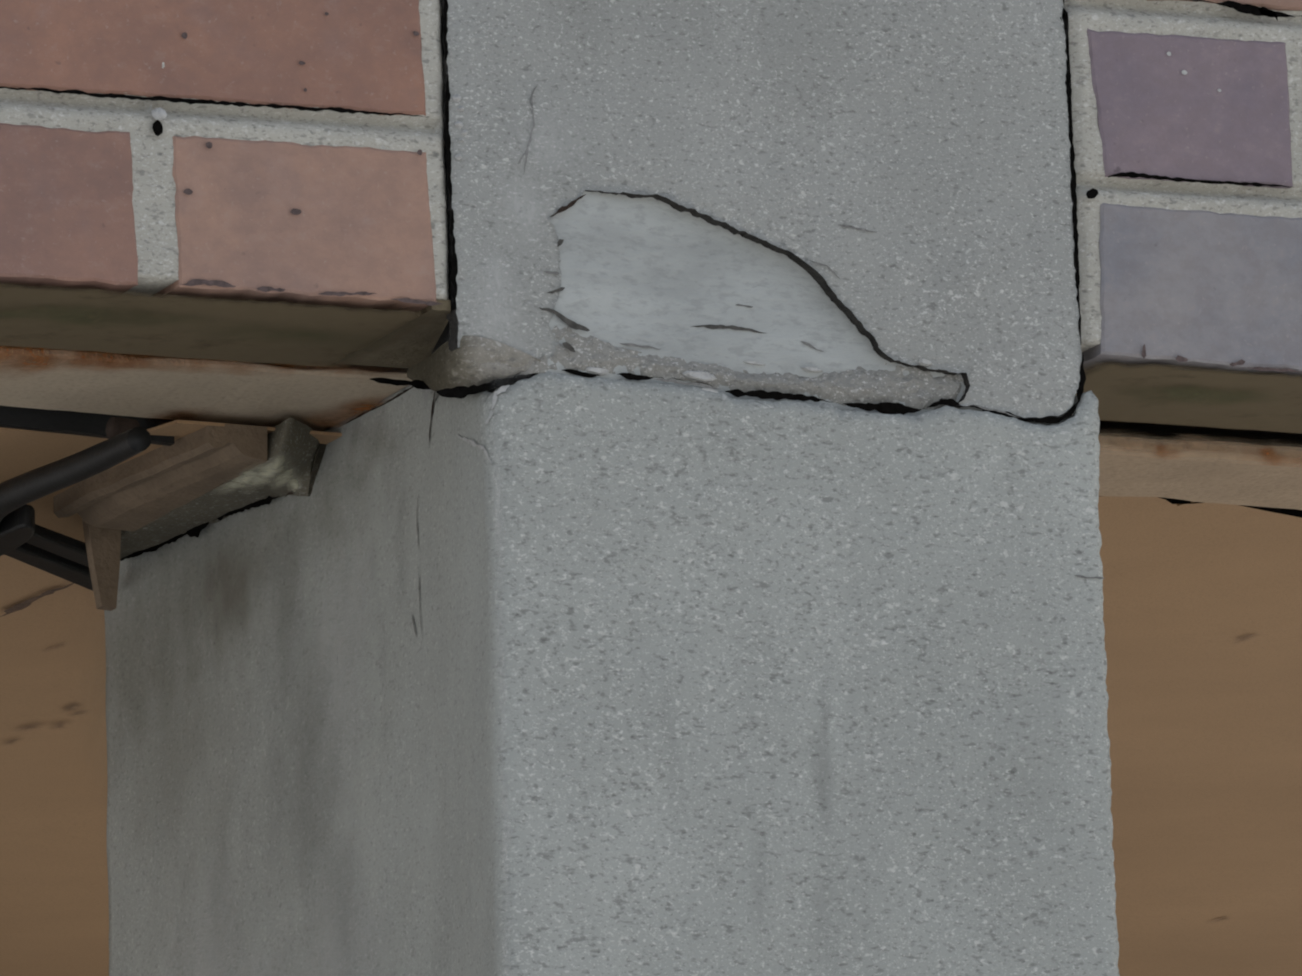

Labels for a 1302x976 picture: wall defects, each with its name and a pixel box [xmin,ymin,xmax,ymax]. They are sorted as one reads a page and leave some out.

crack [1190,0,1294,21]
crack [1108,172,1289,187]
crack [344,0,1086,443]
spalling [485,191,982,424]
crack [0,583,74,617]